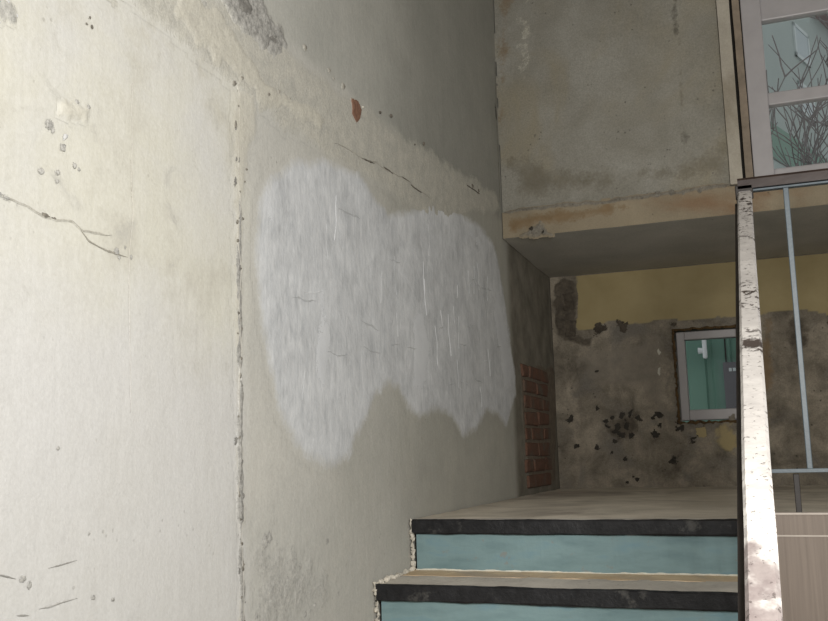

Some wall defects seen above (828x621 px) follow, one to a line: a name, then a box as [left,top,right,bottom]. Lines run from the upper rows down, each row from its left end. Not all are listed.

crack [0,192,133,260]
crack [335,143,430,198]
crack [228,76,260,621]
water stain [493,291,512,394]
peeling [552,262,736,420]
peeling [756,253,828,372]